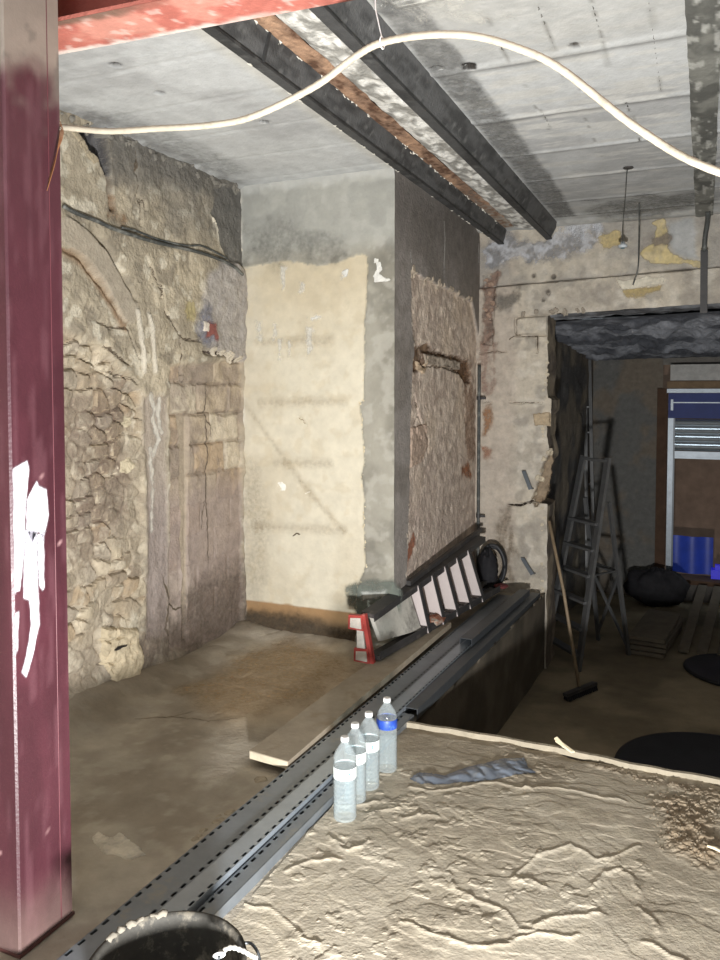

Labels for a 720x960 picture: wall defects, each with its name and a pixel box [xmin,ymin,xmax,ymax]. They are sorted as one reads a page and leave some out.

crack [201,382,211,563]
flaking render [410,424,428,468]
corrosion [472,407,492,435]
spalling [508,412,554,531]
flaking render [406,523,415,577]